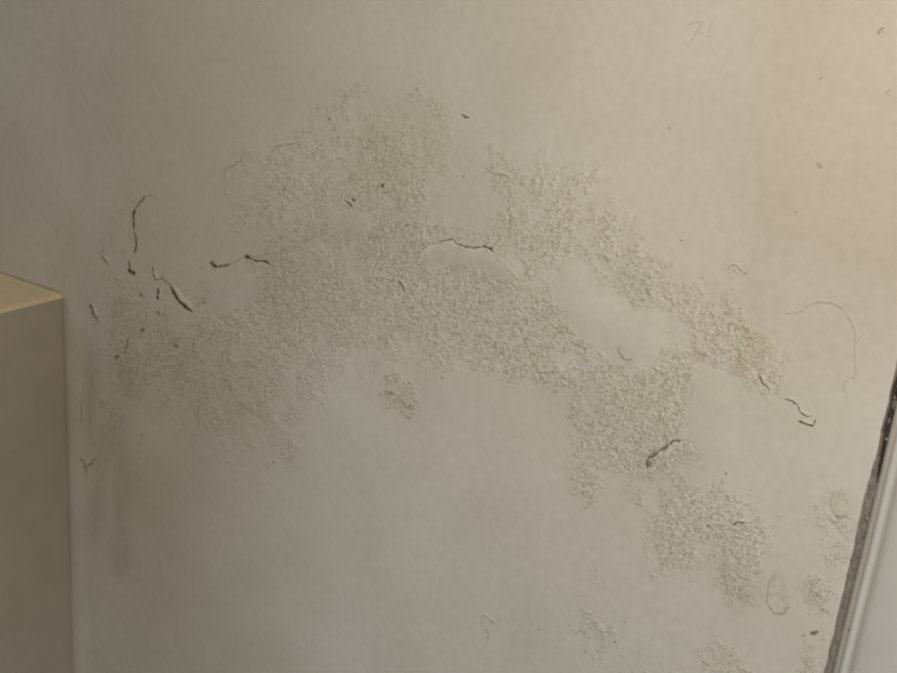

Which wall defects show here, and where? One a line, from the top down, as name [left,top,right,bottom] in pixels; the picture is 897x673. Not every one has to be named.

crack [90,195,193,359]
crack [200,249,284,270]
crack [368,238,520,292]
crack [759,374,816,426]
crack [646,439,699,469]